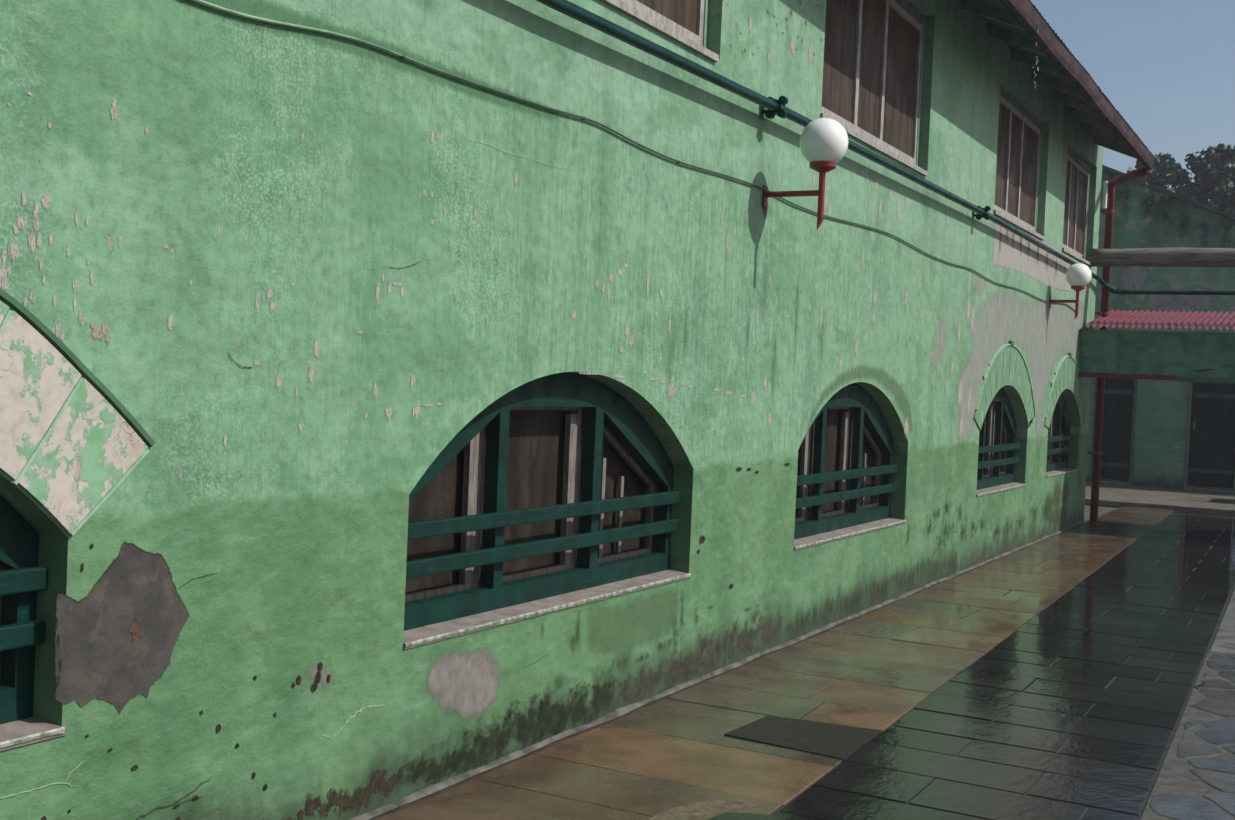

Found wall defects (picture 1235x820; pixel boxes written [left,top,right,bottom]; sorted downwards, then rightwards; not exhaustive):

peeling [0,190,64,340]
peeling [73,259,110,344]
peeling [276,340,320,395]
damp [929,482,1068,546]
flaking render [55,541,190,714]
flaking render [428,650,499,717]
damp [288,682,627,820]